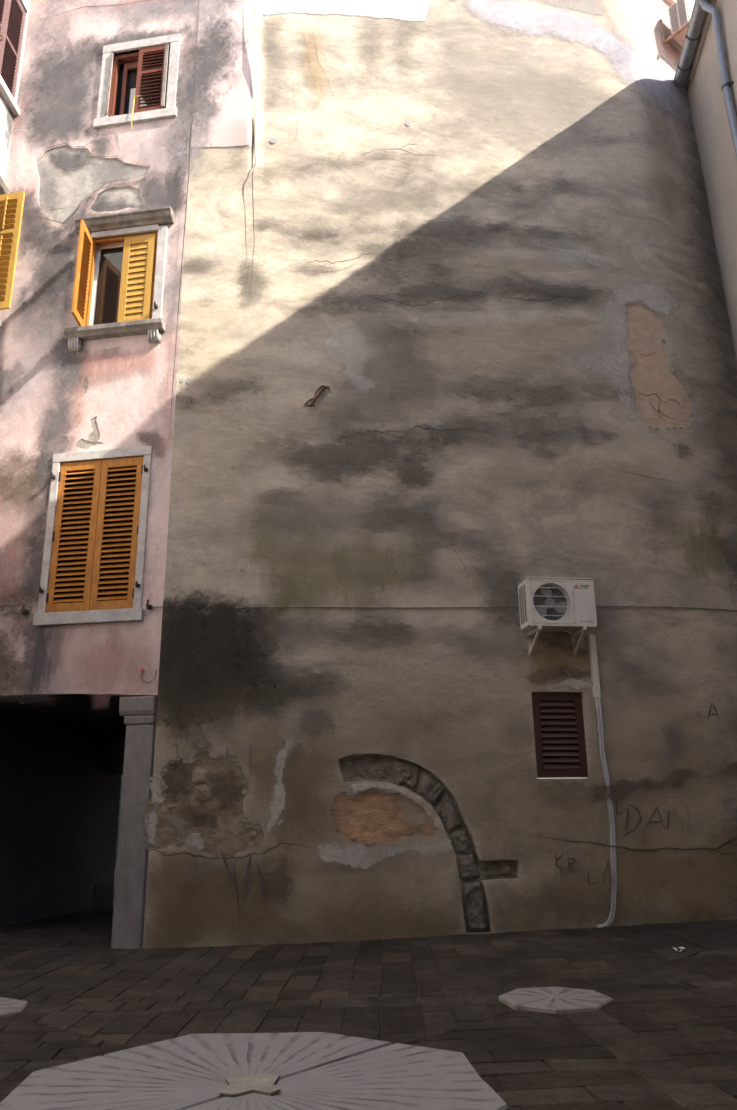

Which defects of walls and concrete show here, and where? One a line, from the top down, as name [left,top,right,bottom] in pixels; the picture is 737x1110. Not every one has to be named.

peeling [263,0,432,21]
peeling [633,0,682,53]
spalling [37,146,150,224]
leakage [0,0,234,697]
spalling [616,302,693,433]
leakage [156,591,412,839]
spalling [144,747,264,858]
spalling [329,788,439,848]
crack [529,833,737,855]